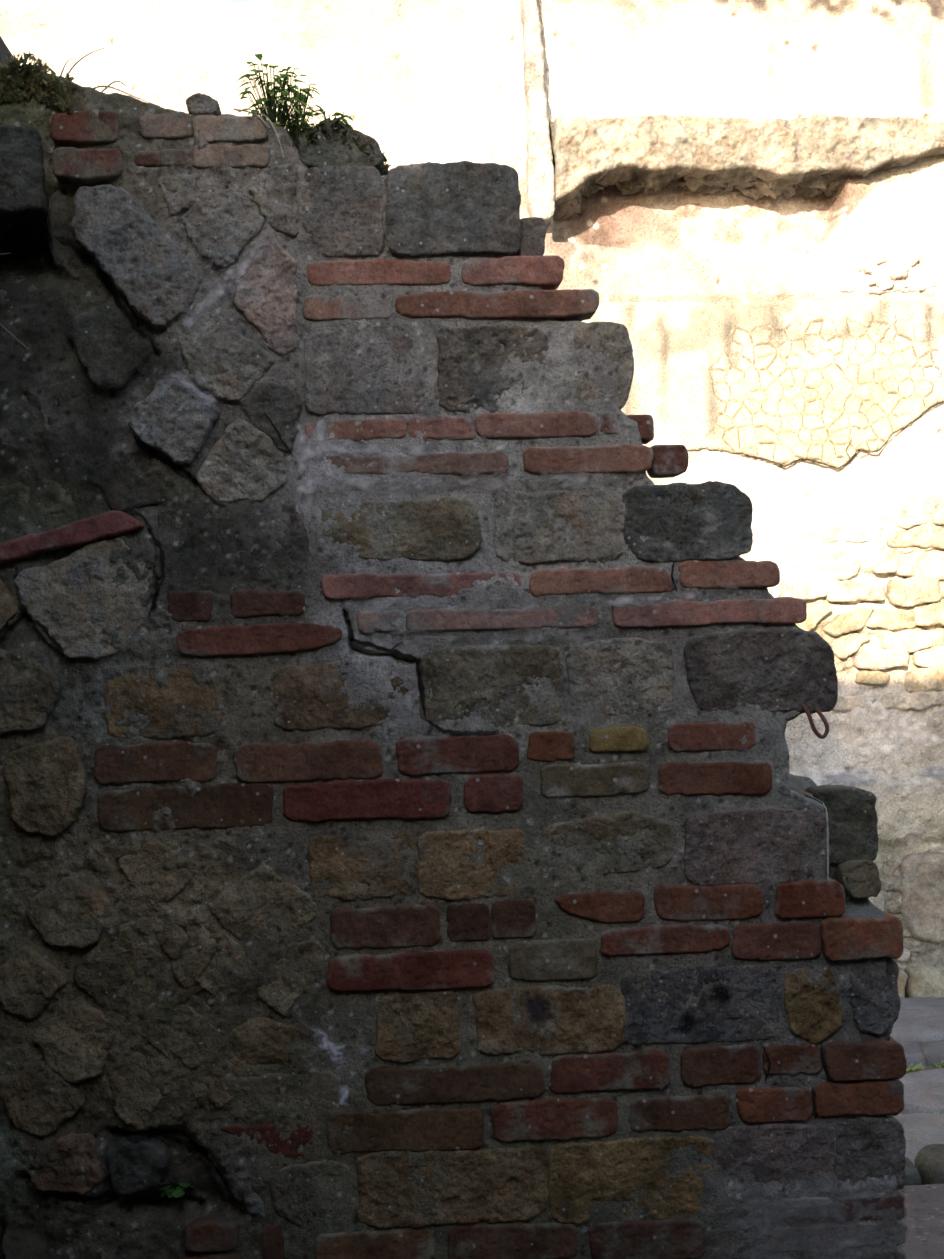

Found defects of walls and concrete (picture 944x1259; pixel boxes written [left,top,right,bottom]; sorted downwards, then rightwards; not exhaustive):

crack [709,315,944,471]
peeling [756,445,944,584]
crack [344,610,499,735]
peeling [850,699,940,744]